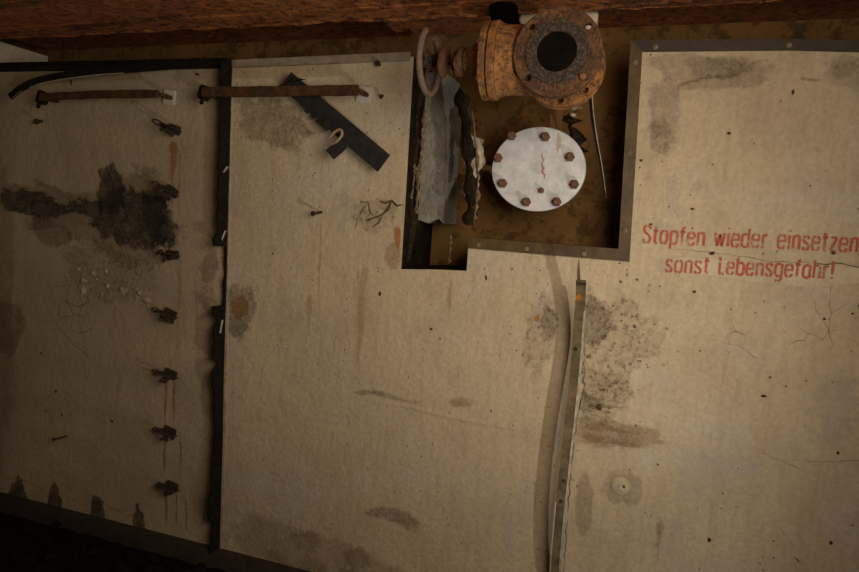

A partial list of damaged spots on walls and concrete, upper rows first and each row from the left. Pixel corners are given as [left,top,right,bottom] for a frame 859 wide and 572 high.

water stain [1,164,177,267]
crack [677,249,859,346]
crack [563,348,586,572]